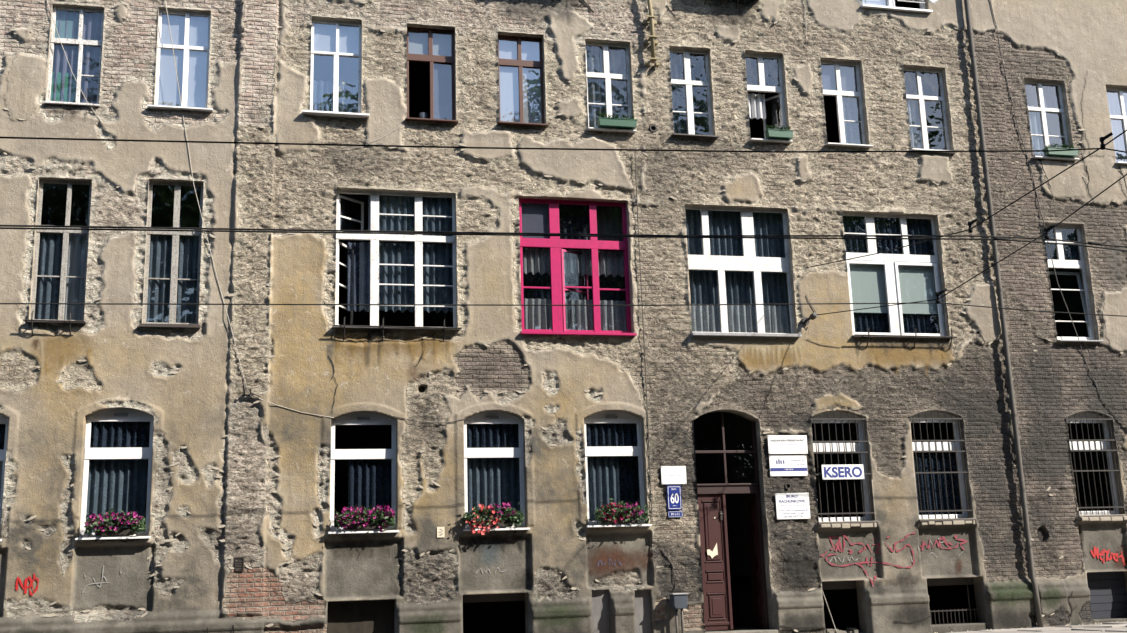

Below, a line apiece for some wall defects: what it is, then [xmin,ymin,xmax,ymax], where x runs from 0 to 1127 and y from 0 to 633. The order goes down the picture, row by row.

spalling [0,0,981,151]
spalling [0,152,216,341]
spalling [972,28,1127,579]
spalling [0,349,41,391]
spalling [55,357,102,390]
spalling [99,400,158,425]
spalling [198,125,1030,622]
spalling [1,450,18,537]
spalling [23,454,77,576]
spalling [4,598,148,623]
spalling [683,604,705,631]
spalling [1029,602,1094,628]